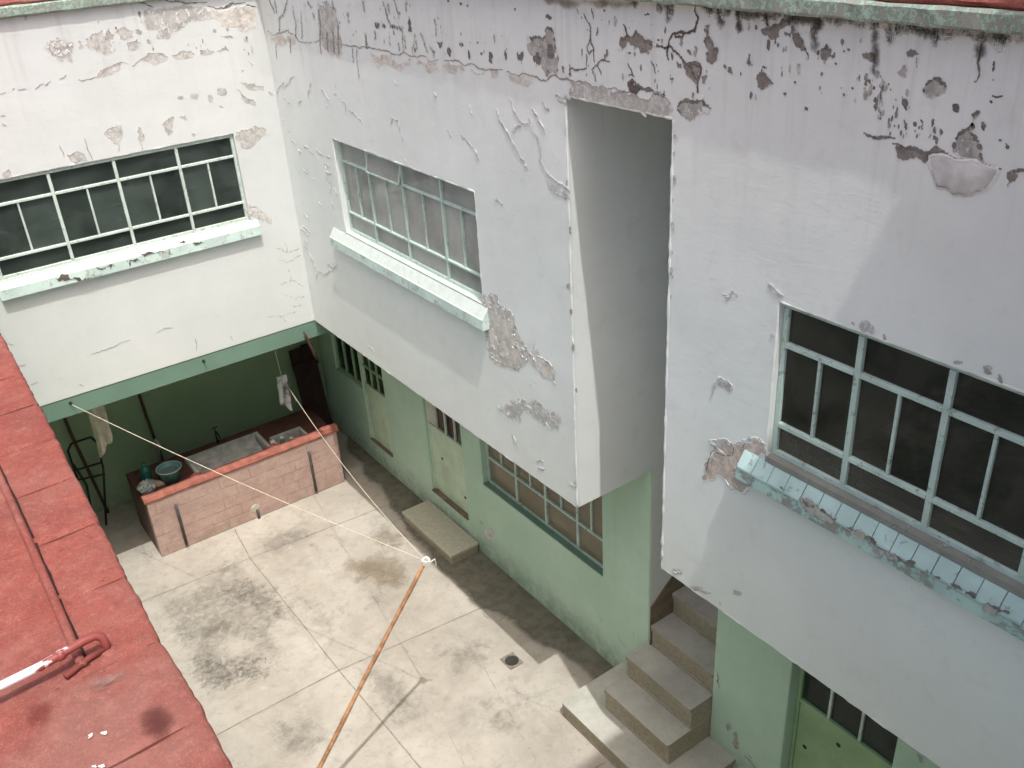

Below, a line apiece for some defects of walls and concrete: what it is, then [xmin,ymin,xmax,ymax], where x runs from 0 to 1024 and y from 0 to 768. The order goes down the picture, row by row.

peeling [77,4,363,124]
crack [267,8,703,113]
flaking render [569,9,949,165]
peeling [104,123,124,145]
peeling [161,114,196,138]
peeling [235,125,267,150]
spalling [1005,171,1020,188]
peeling [57,264,112,281]
peeling [483,293,556,385]
peeling [498,399,561,447]
peeling [701,436,768,494]
spalling [780,486,1010,618]